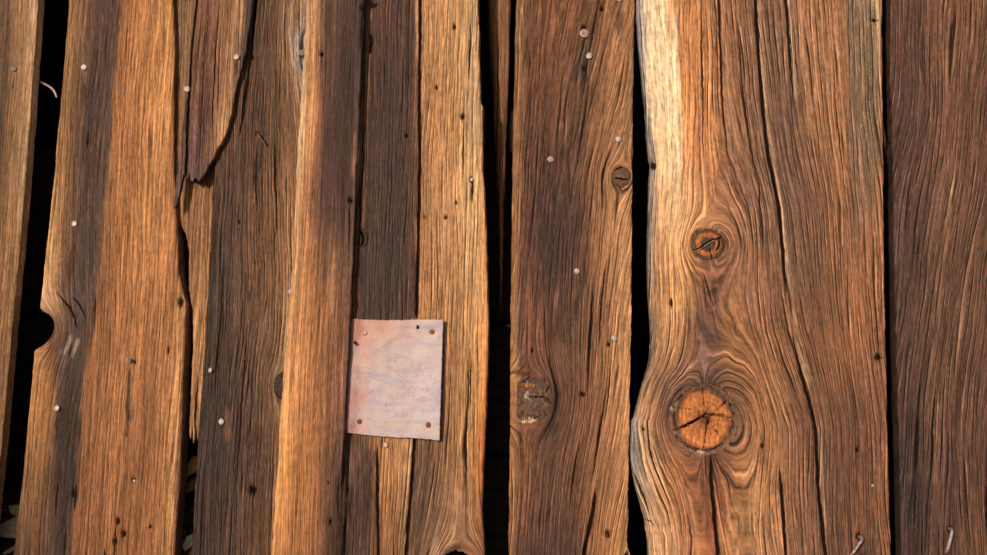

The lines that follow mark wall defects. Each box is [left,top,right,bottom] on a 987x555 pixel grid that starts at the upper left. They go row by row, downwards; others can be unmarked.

crack [185,0,220,176]
crack [700,0,786,289]
crack [570,265,612,555]
crack [779,468,787,555]
crack [792,336,827,555]
crack [979,487,987,532]